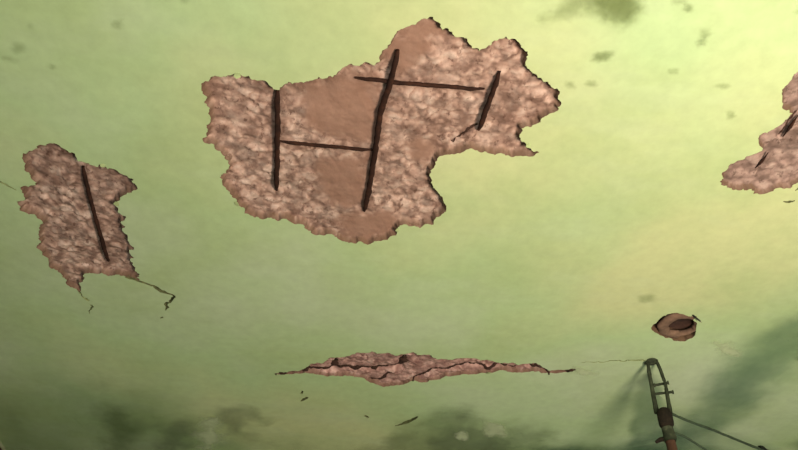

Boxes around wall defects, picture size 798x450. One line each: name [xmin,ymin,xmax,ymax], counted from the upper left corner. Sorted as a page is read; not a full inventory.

spalling [201,17,561,245]
spalling [720,72,798,194]
spalling [17,143,140,292]
crack [125,275,176,318]
spalling [275,351,576,387]